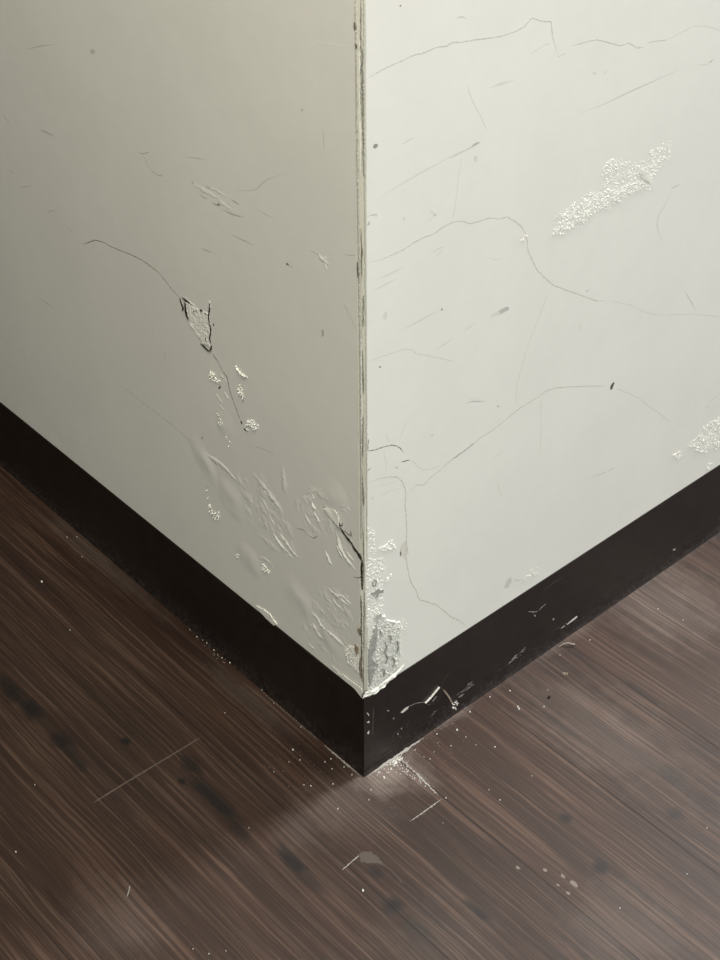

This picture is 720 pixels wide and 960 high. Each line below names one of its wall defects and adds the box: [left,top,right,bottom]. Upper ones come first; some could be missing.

spalling [552,141,670,236]
crack [82,240,240,418]
peeling [185,296,214,348]
crack [339,0,718,693]
spalling [673,417,720,460]
flaking render [344,528,407,699]